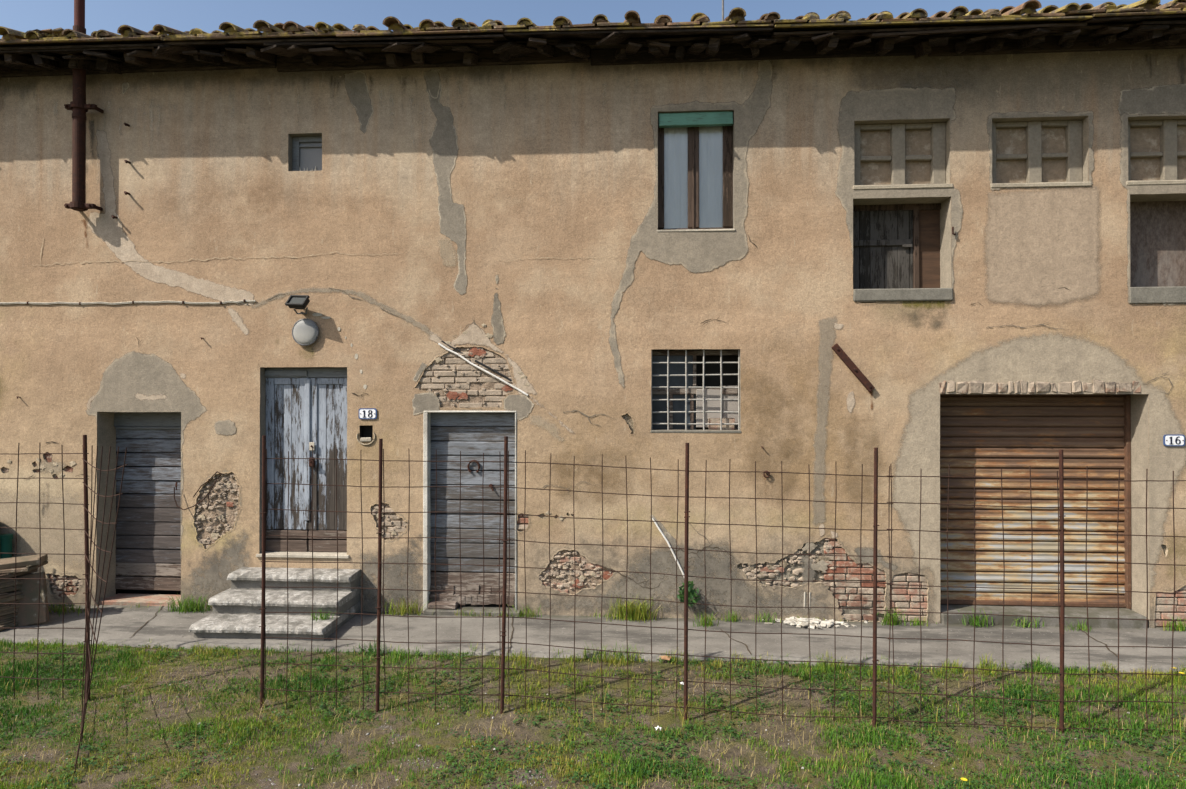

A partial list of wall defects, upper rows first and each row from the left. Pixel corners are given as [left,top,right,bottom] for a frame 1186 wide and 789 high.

flaking render [414,323,537,411]
flaking render [192,470,242,550]
flaking render [369,501,410,542]
flaking render [537,548,617,597]
flaking render [714,524,930,623]
flaking render [1153,584,1186,628]